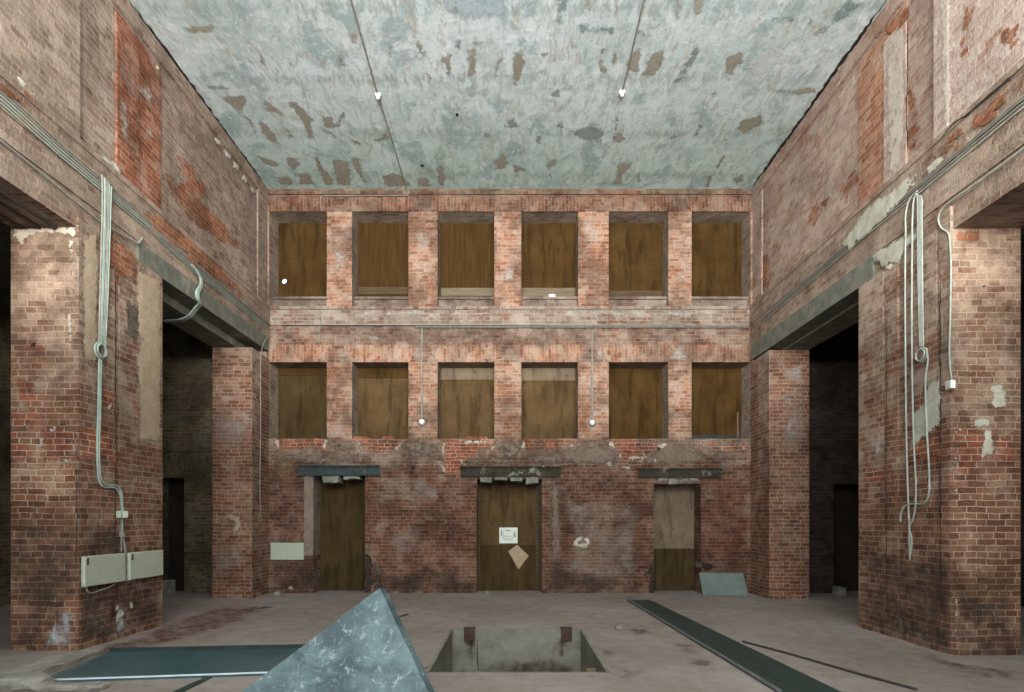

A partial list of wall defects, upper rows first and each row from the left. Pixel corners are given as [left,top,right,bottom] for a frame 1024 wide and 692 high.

peeling [496,51,525,85]
peeling [599,48,663,75]
peeling [261,157,366,185]
peeling [383,164,446,186]
flaking render [162,152,238,249]
flaking render [144,210,244,300]
flaking render [441,435,576,474]